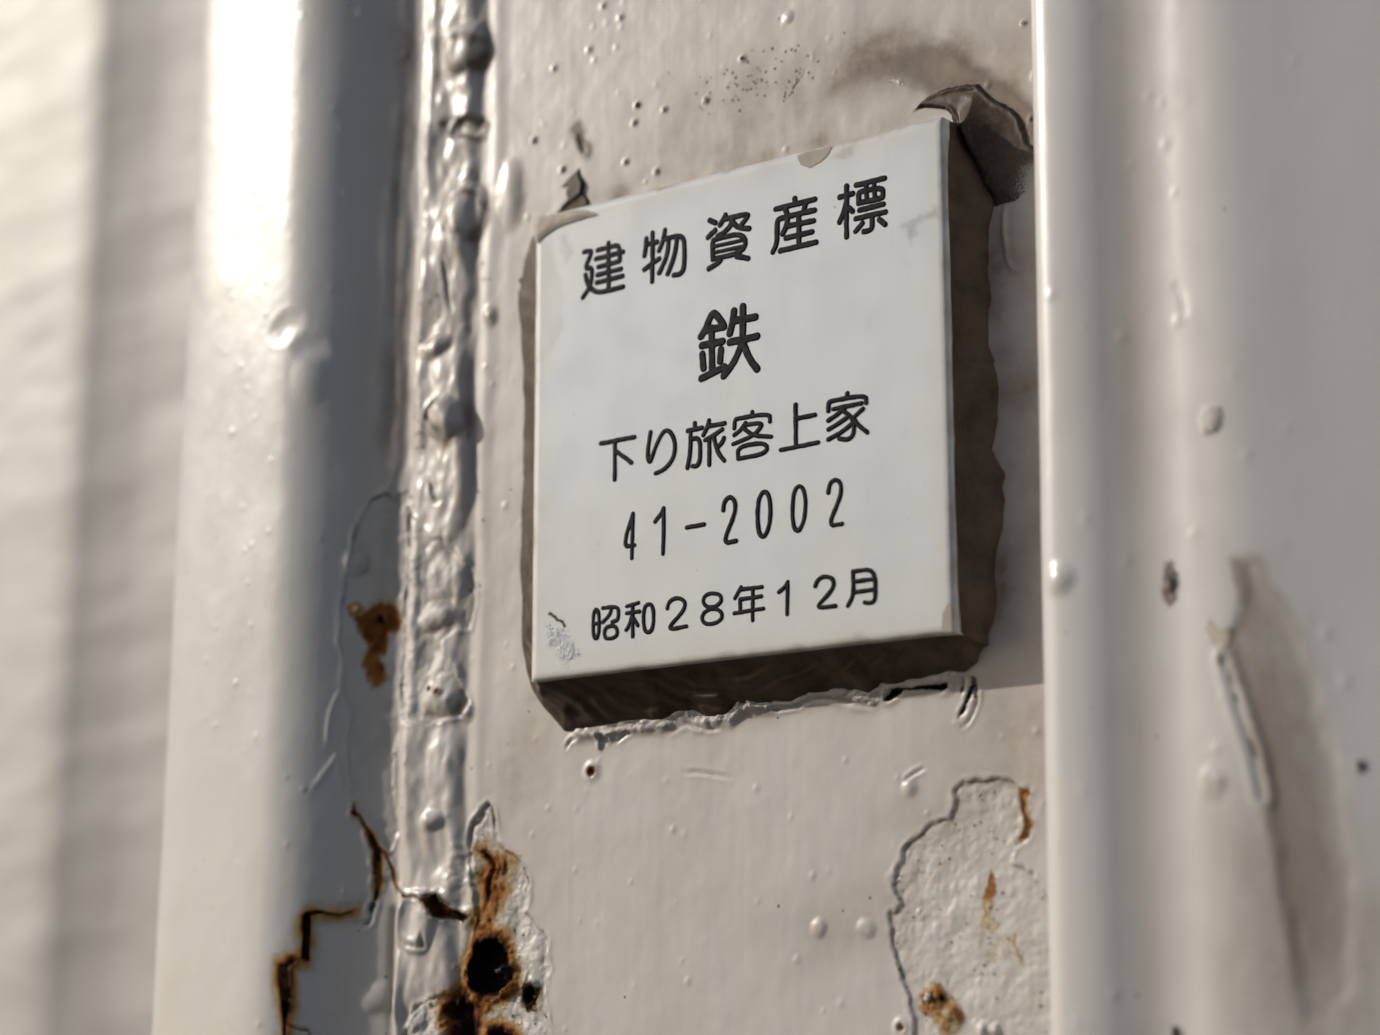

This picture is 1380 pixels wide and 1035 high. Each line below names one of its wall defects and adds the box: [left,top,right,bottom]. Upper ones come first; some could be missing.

corrosion [347,592,407,693]
damp [1206,556,1323,934]
peeling [404,991,455,1035]
corrosion [425,830,530,1035]
peeling [416,810,556,1035]
corrosion [917,982,967,1035]
peeling [889,777,1051,1035]